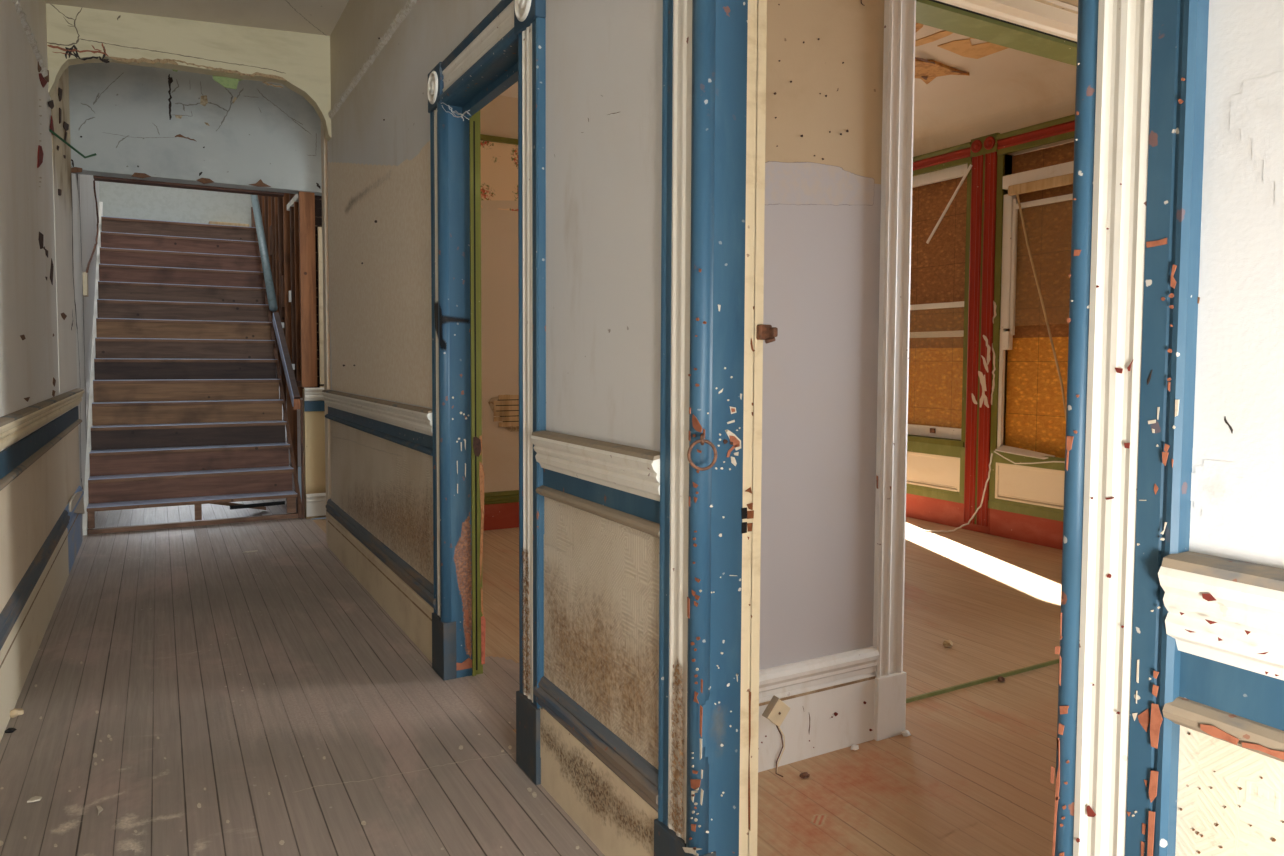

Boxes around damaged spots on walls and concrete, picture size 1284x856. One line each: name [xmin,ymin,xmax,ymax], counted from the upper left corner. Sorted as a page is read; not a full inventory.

crack [47,4,317,156]
peeling [915,23,1008,84]
peeling [688,367,742,470]
peeling [1148,378,1179,467]
damp [325,414,434,585]
damp [522,534,684,856]
peeling [682,637,732,856]
damp [702,689,736,769]
peeling [1050,706,1069,856]
peeling [1116,660,1163,749]
peeling [1126,770,1158,856]
peeling [1188,724,1284,760]